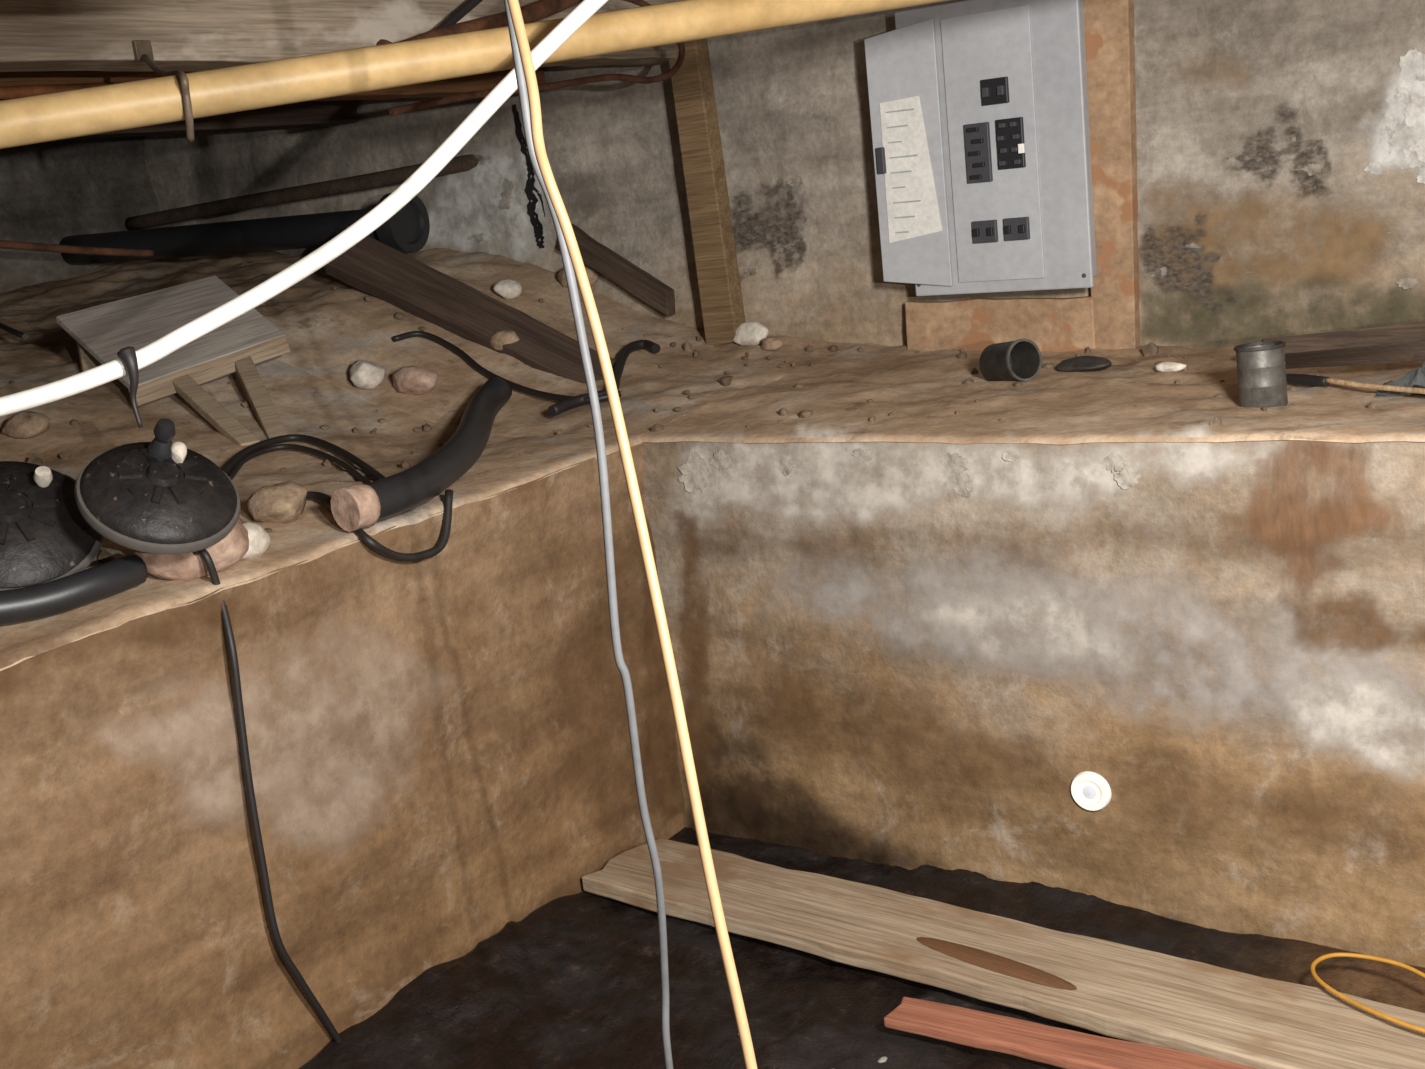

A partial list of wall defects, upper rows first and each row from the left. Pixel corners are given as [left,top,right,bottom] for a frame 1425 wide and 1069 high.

crack [512,104,545,248]
water stain [819,563,1425,773]